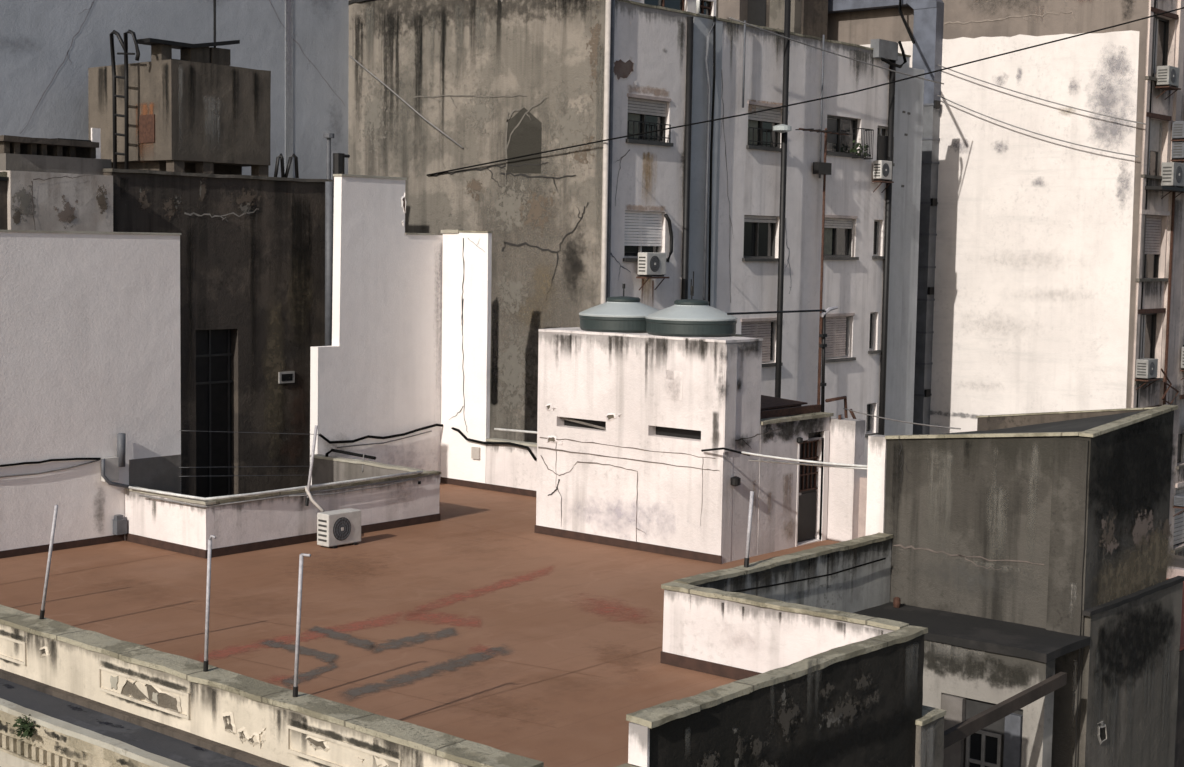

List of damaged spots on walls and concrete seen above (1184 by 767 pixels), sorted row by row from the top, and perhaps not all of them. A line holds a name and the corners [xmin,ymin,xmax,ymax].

crack [20,0,95,134]
damp [355,0,586,126]
peeling [542,4,637,183]
peeling [12,184,36,225]
crack [184,208,257,220]
crack [412,94,630,431]
damp [645,338,667,369]
damp [685,339,727,361]
crack [538,429,781,534]
peeling [1099,505,1172,560]
damp [1089,420,1184,528]
spalling [110,676,182,712]